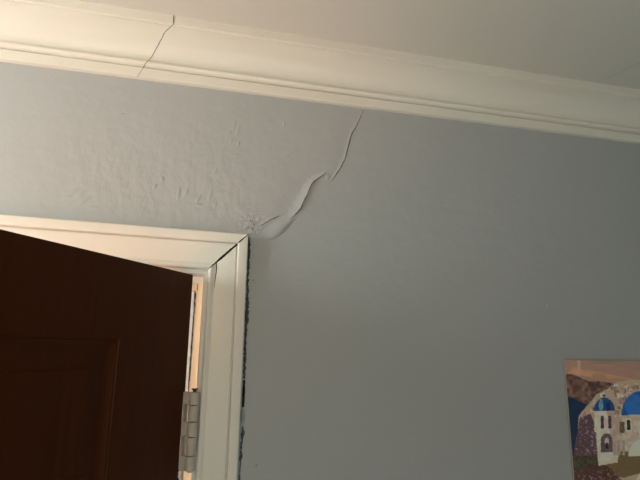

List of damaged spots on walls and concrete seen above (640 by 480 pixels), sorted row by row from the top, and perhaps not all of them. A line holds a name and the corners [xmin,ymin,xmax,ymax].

crack [330,110,364,181]
peeling [287,170,331,219]